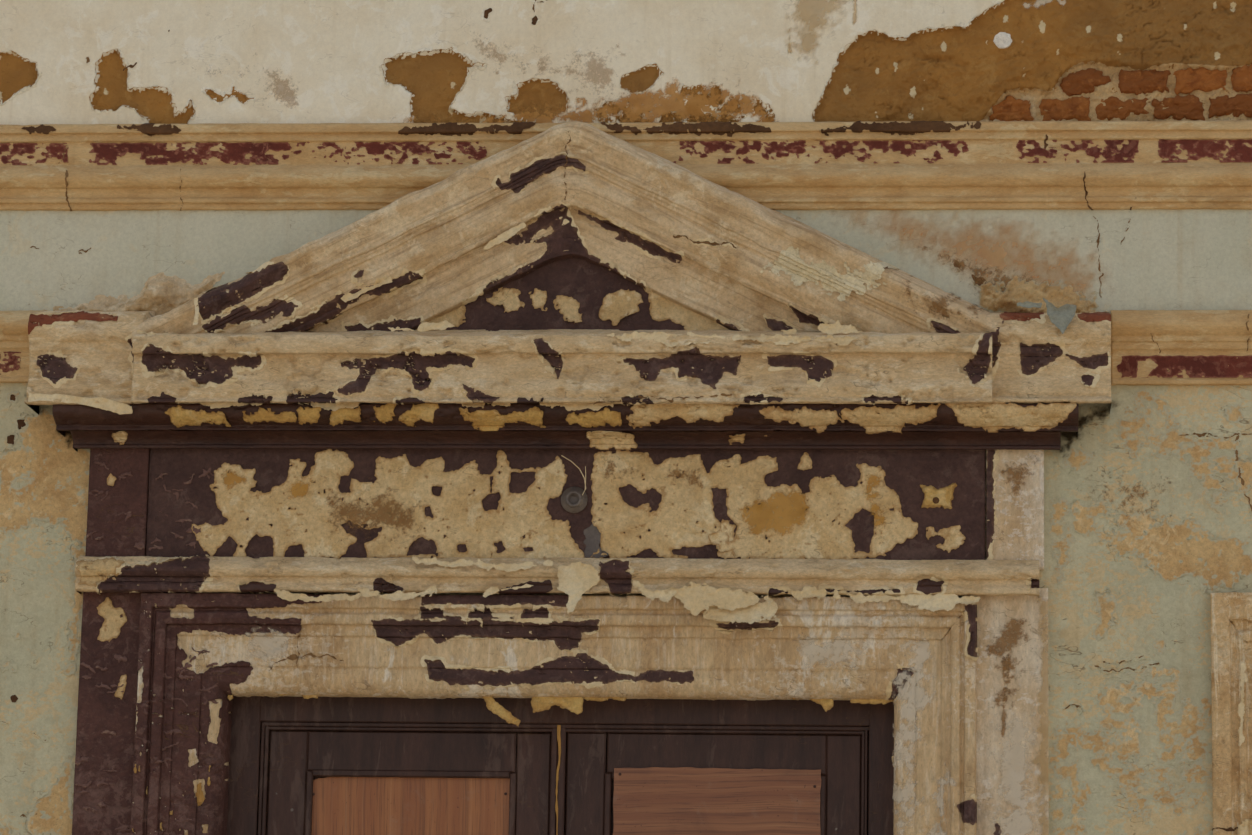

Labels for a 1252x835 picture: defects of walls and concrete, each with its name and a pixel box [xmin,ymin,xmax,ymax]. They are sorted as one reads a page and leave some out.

flaking render [0,48,42,106]
flaking render [592,0,1252,164]
peeling [491,152,589,193]
peeling [1016,298,1252,388]
crack [1180,430,1252,517]
flaking render [1063,500,1252,594]
peeling [1237,662,1248,746]
peeling [1237,819,1252,835]